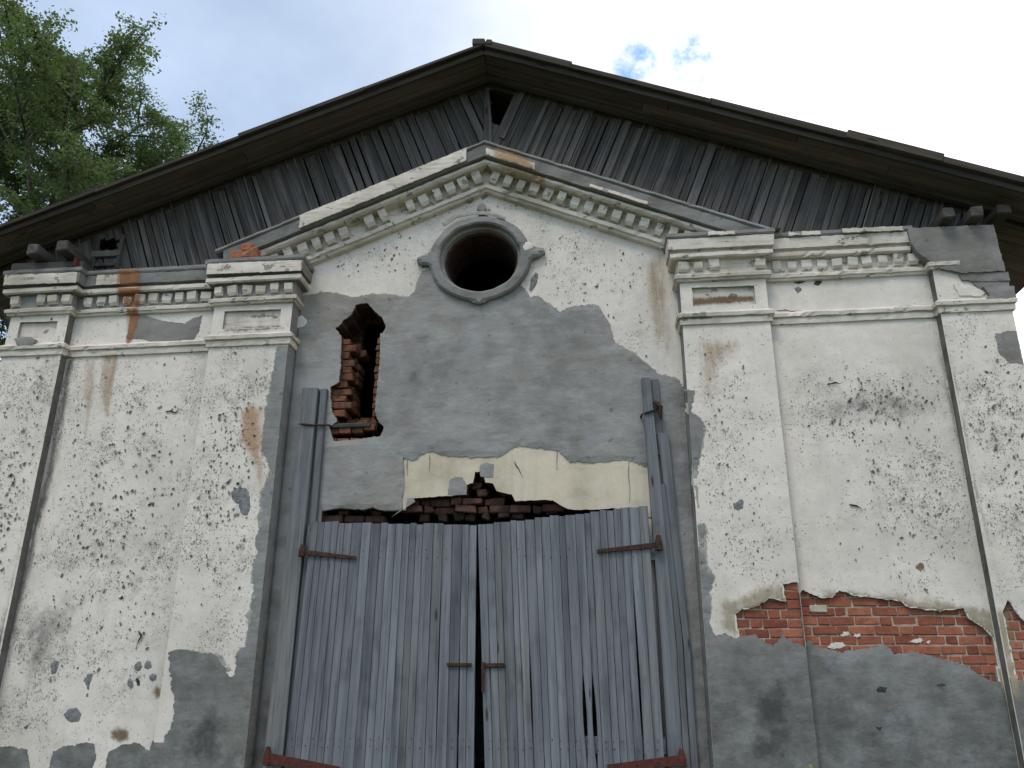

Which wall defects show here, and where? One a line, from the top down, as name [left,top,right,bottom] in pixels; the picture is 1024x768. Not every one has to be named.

corrosion [118,269,143,345]
flaking render [953,284,986,297]
flaking render [33,357,261,688]
corrosion [243,408,259,457]
flaking render [323,446,651,525]
flaking render [707,365,765,535]
flaking render [969,404,1024,518]
flaking render [64,708,81,723]
flaking render [77,657,111,697]
flaking render [732,539,997,682]
flaking render [1003,602,1024,681]